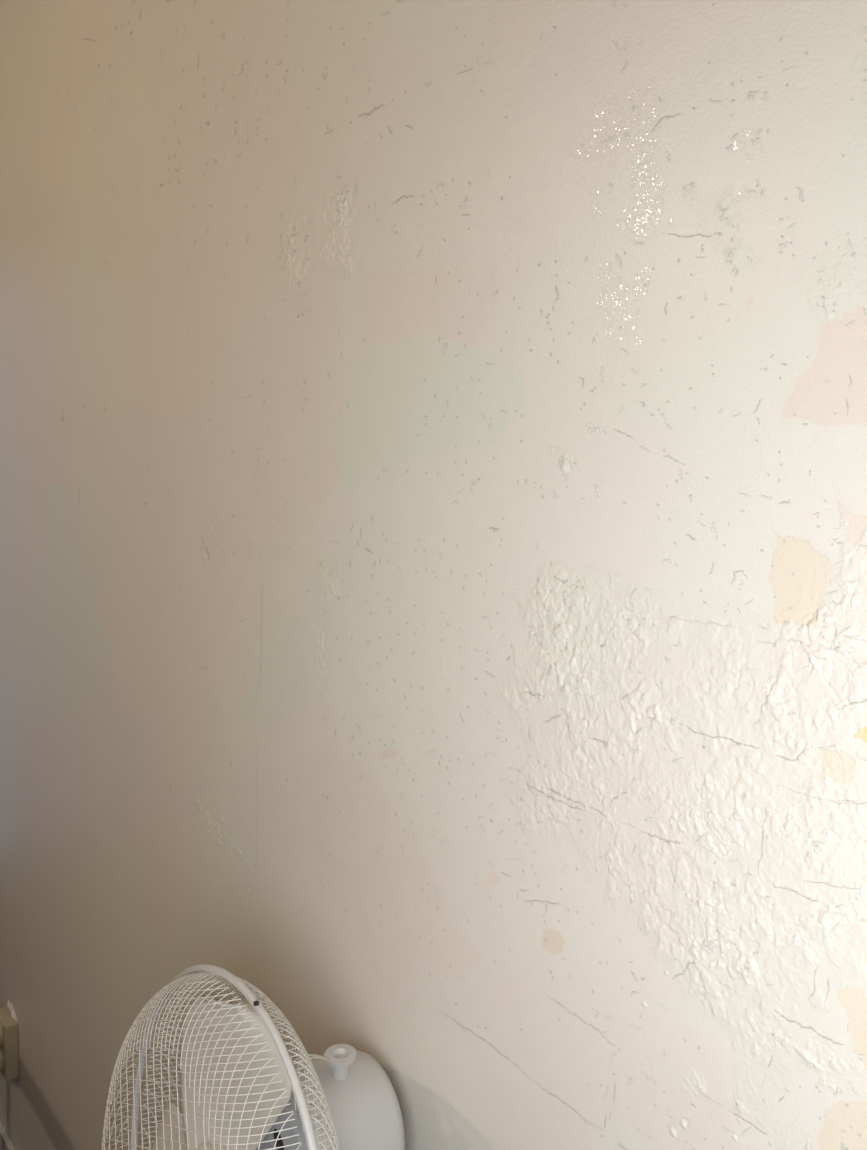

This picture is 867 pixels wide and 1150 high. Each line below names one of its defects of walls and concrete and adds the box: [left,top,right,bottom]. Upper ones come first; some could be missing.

crack [441,1011,628,1150]